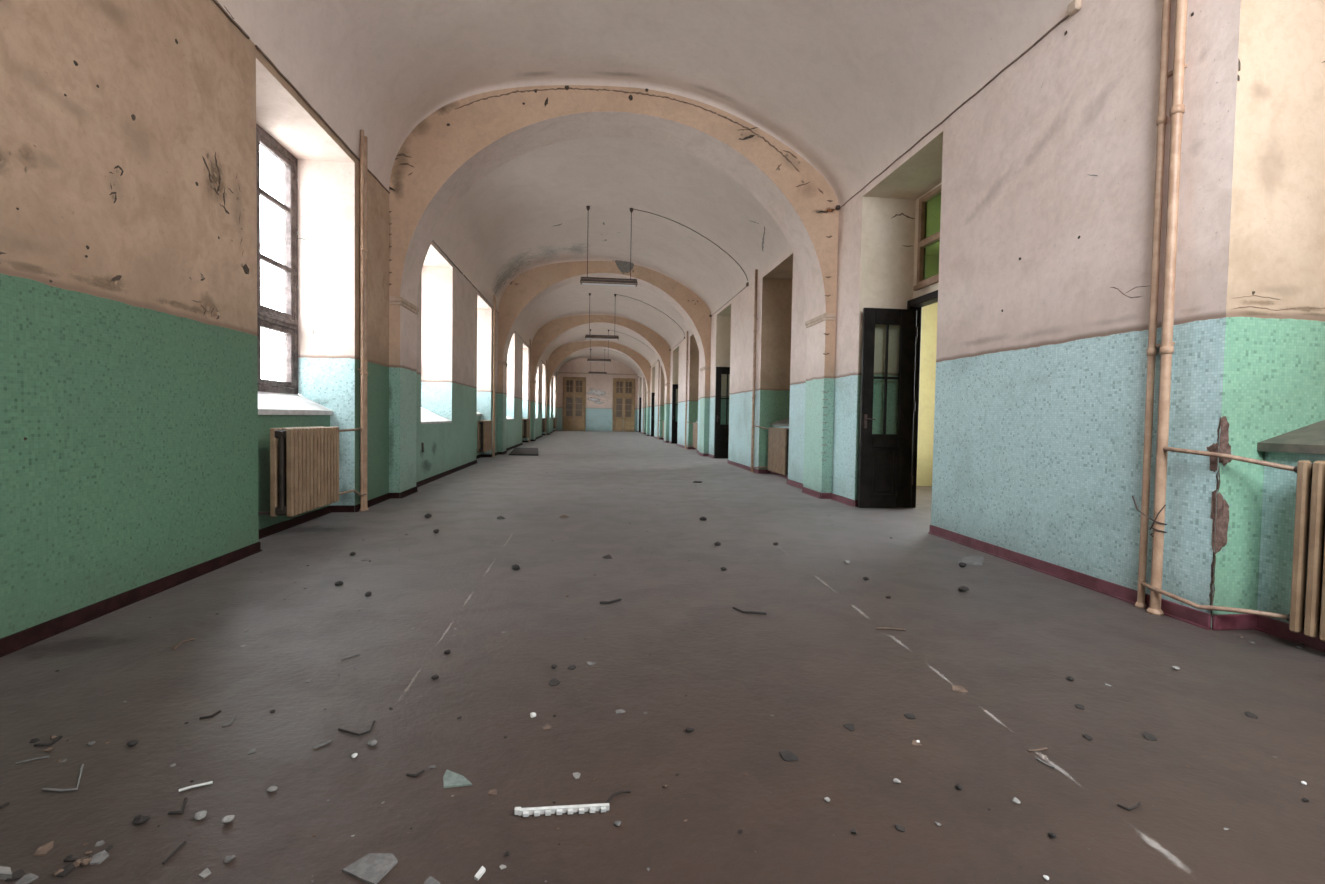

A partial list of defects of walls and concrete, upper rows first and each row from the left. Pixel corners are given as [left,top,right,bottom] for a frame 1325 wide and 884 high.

crack [1111,285,1151,298]
spalling [1206,416,1233,616]